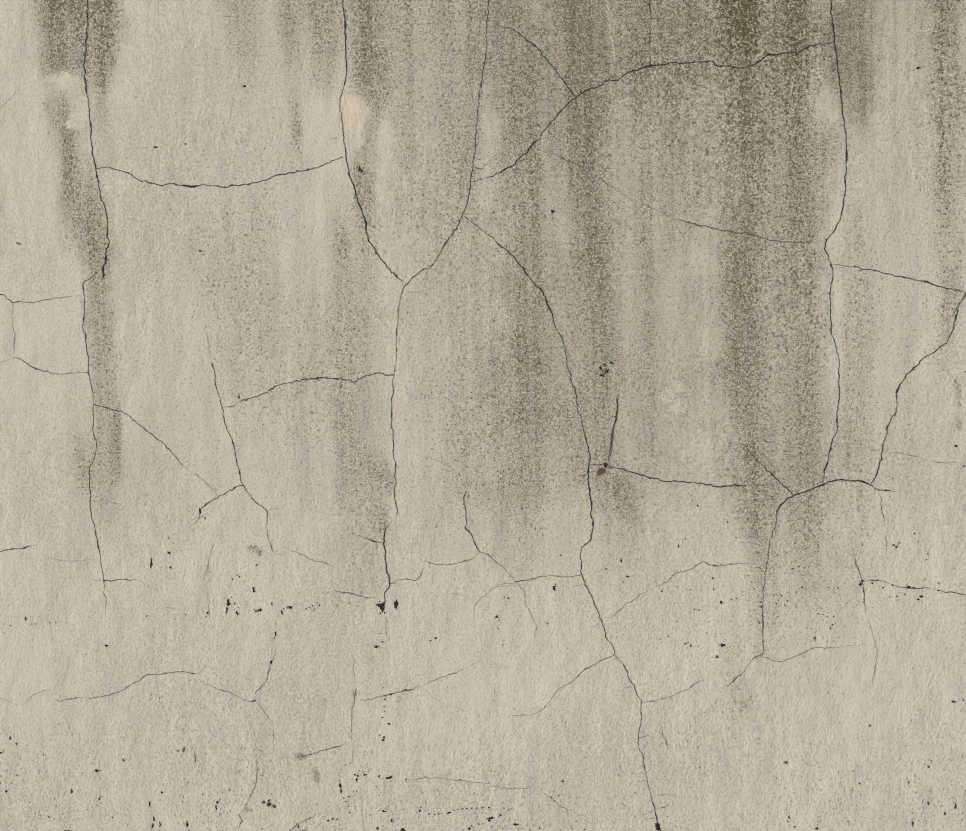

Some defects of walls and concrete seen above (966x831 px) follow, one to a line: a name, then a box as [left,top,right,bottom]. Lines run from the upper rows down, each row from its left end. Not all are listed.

leakage [34,0,120,104]
leakage [51,100,113,351]
crack [0,0,966,607]
leakage [350,0,866,544]
crack [477,225,743,831]
leakage [932,0,963,215]